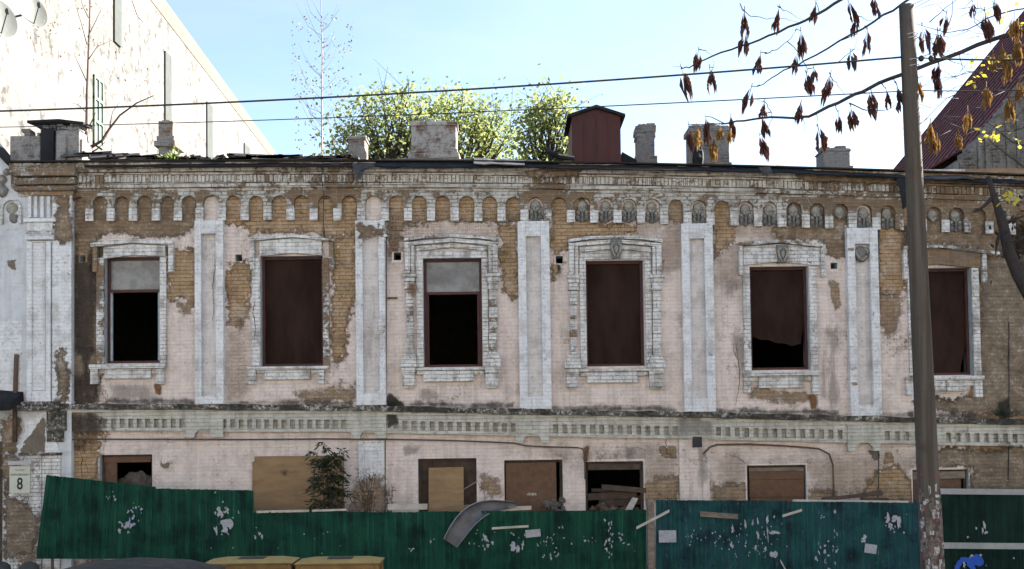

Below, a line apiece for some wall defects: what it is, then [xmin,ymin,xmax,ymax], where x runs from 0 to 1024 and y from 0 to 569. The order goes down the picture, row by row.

peeling [52,290,102,403]
damp [72,247,104,450]
peeling [52,195,196,315]
peeling [225,196,529,367]
peeling [750,387,809,406]
flaking render [829,278,841,309]
peeling [879,206,908,335]
peeling [0,414,46,560]
peeling [480,473,501,497]
peeling [645,476,679,500]
peeling [863,450,912,503]